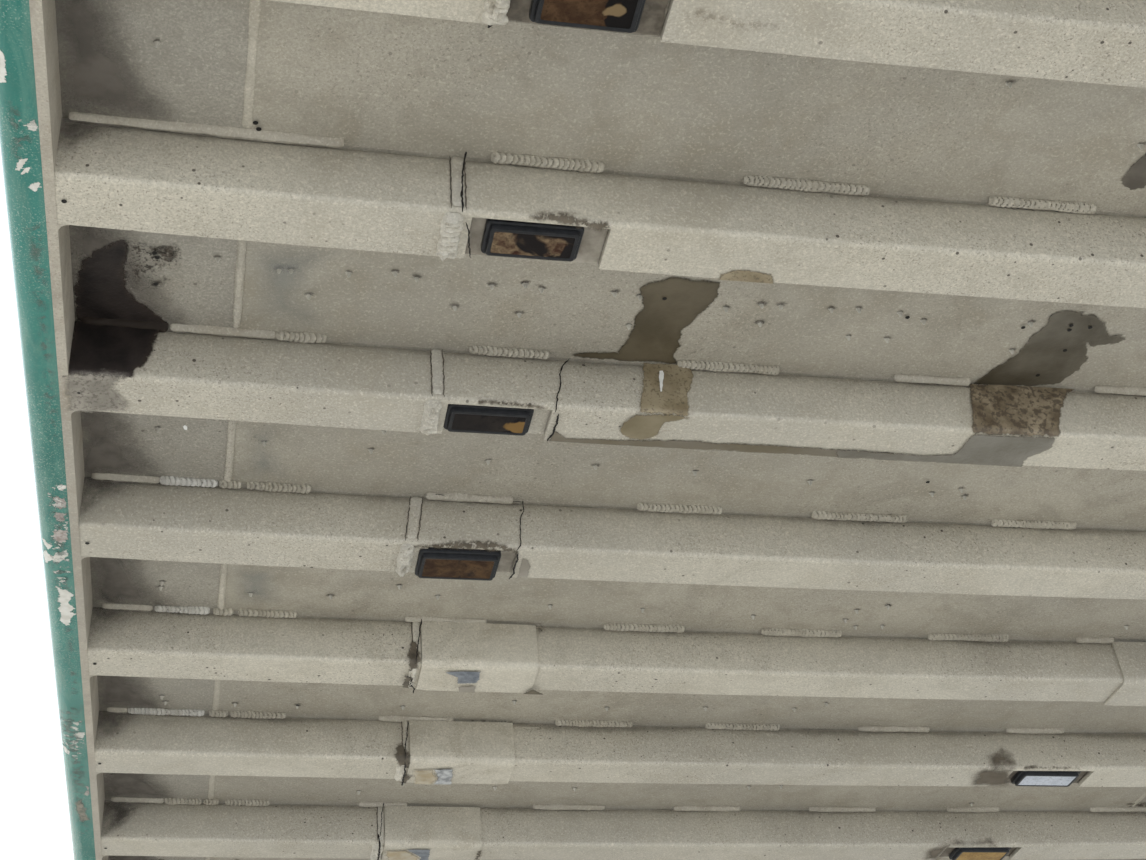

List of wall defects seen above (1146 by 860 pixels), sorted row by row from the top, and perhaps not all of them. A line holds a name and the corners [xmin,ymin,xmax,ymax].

peeling [15,159,42,192]
crack [460,152,471,258]
leakage [67,240,177,412]
crack [547,359,569,441]
peeling [42,484,76,626]
crack [509,501,524,579]
crack [410,619,422,693]
crack [377,722,409,860]